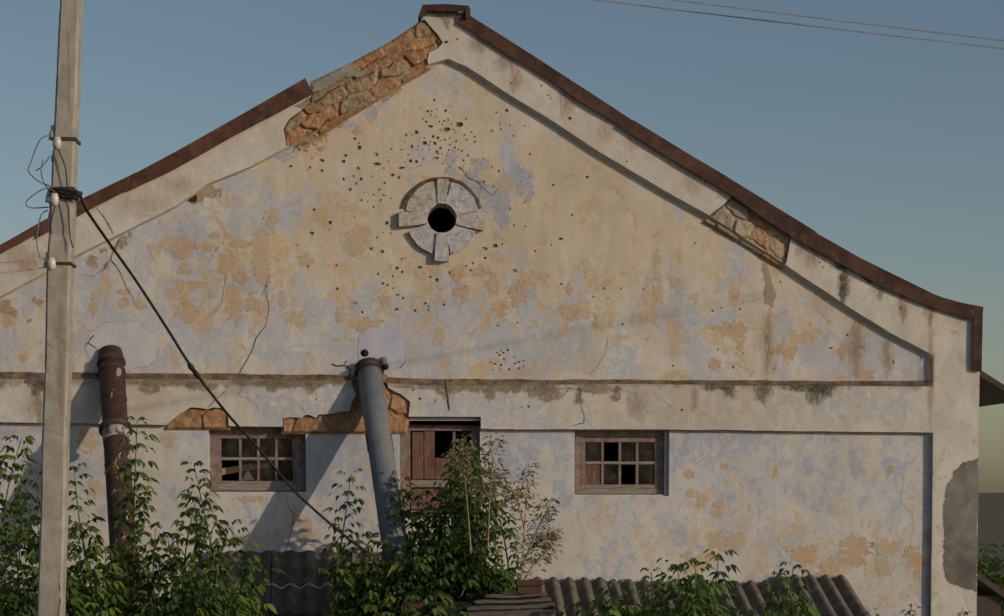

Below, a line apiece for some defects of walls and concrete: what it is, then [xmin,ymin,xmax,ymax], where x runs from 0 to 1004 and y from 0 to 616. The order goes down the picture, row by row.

flaking render [275,20,535,327]
flaking render [702,196,790,308]
damp [835,263,850,302]
peeling [0,299,17,329]
crack [208,285,269,410]
flaking render [158,408,231,447]
flaking render [281,374,366,476]
flaking render [382,374,421,434]
damp [783,383,835,402]